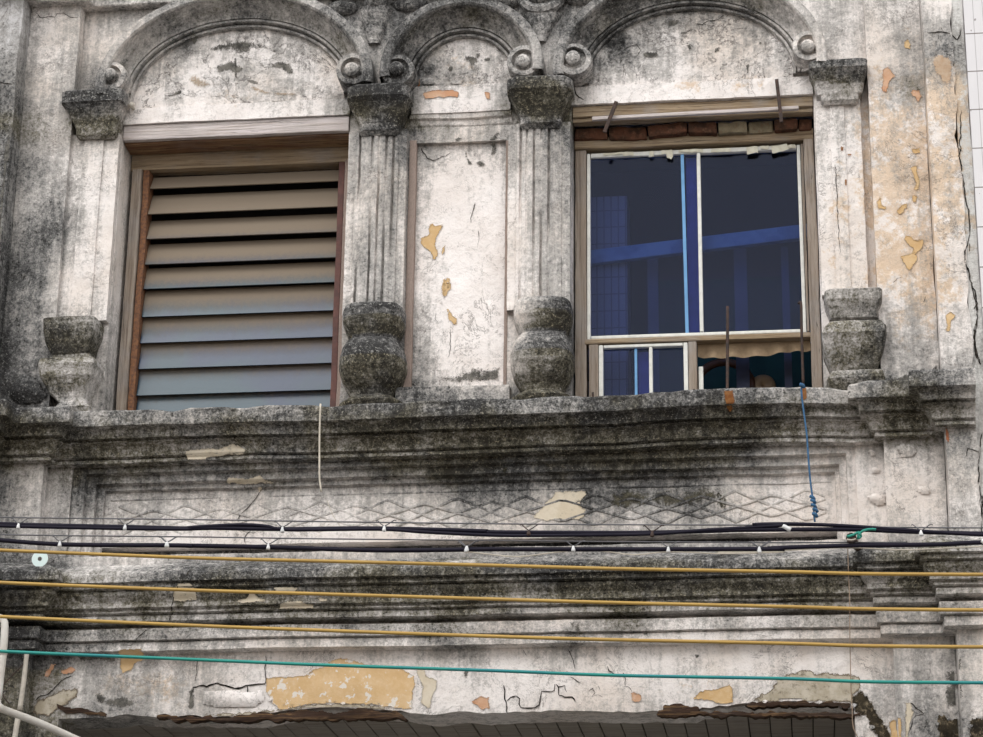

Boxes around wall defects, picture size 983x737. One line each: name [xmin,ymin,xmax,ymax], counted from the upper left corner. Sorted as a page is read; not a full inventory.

peeling [423,89,459,99]
peeling [421,224,445,259]
crack [958,111,981,365]
peeling [442,278,451,296]
peeling [185,444,245,460]
peeling [227,476,273,485]
peeling [534,490,586,521]
leakage [612,487,726,509]
crack [192,656,267,692]
peeling [157,658,437,724]
crack [503,650,632,712]
spalling [657,670,914,737]